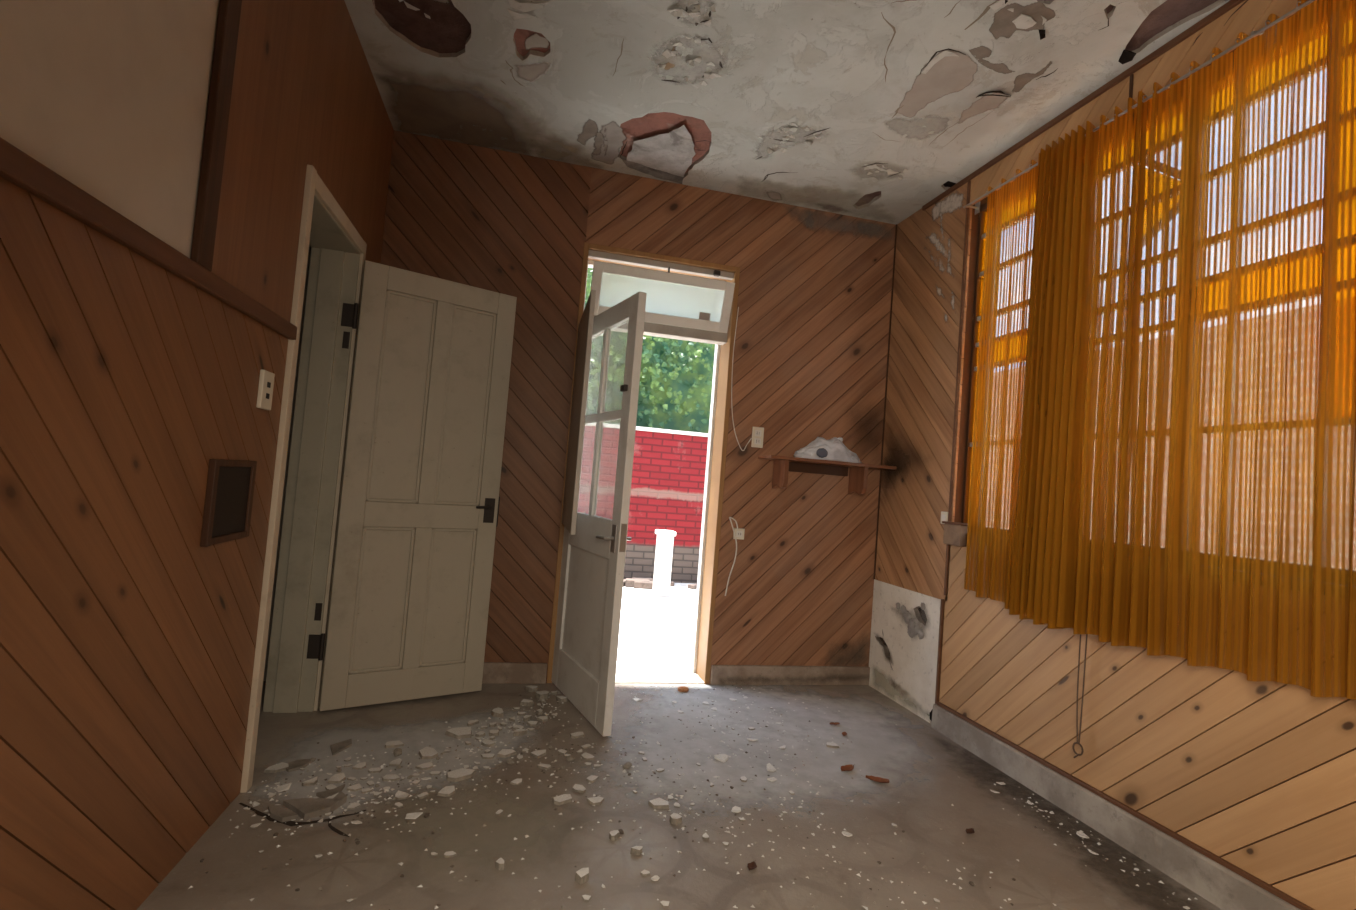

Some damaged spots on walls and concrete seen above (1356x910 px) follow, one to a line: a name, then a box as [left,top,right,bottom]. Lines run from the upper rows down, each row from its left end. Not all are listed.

peeling [653,0,723,86]
peeling [892,0,1058,123]
peeling [577,119,627,164]